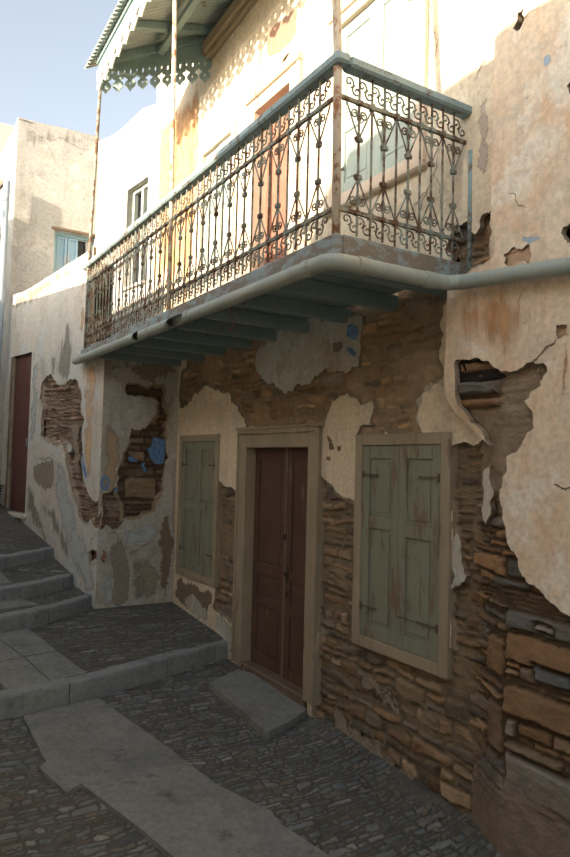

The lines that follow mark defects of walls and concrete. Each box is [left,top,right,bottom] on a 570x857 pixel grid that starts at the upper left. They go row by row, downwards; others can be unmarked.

spalling [513,8,524,31]
rust [159,95,199,201]
rust [156,190,195,302]
flaking render [31,365,170,530]
spalling [89,549,106,563]
water stain [111,541,130,606]
water stain [141,516,174,599]
flaking render [175,289,570,857]